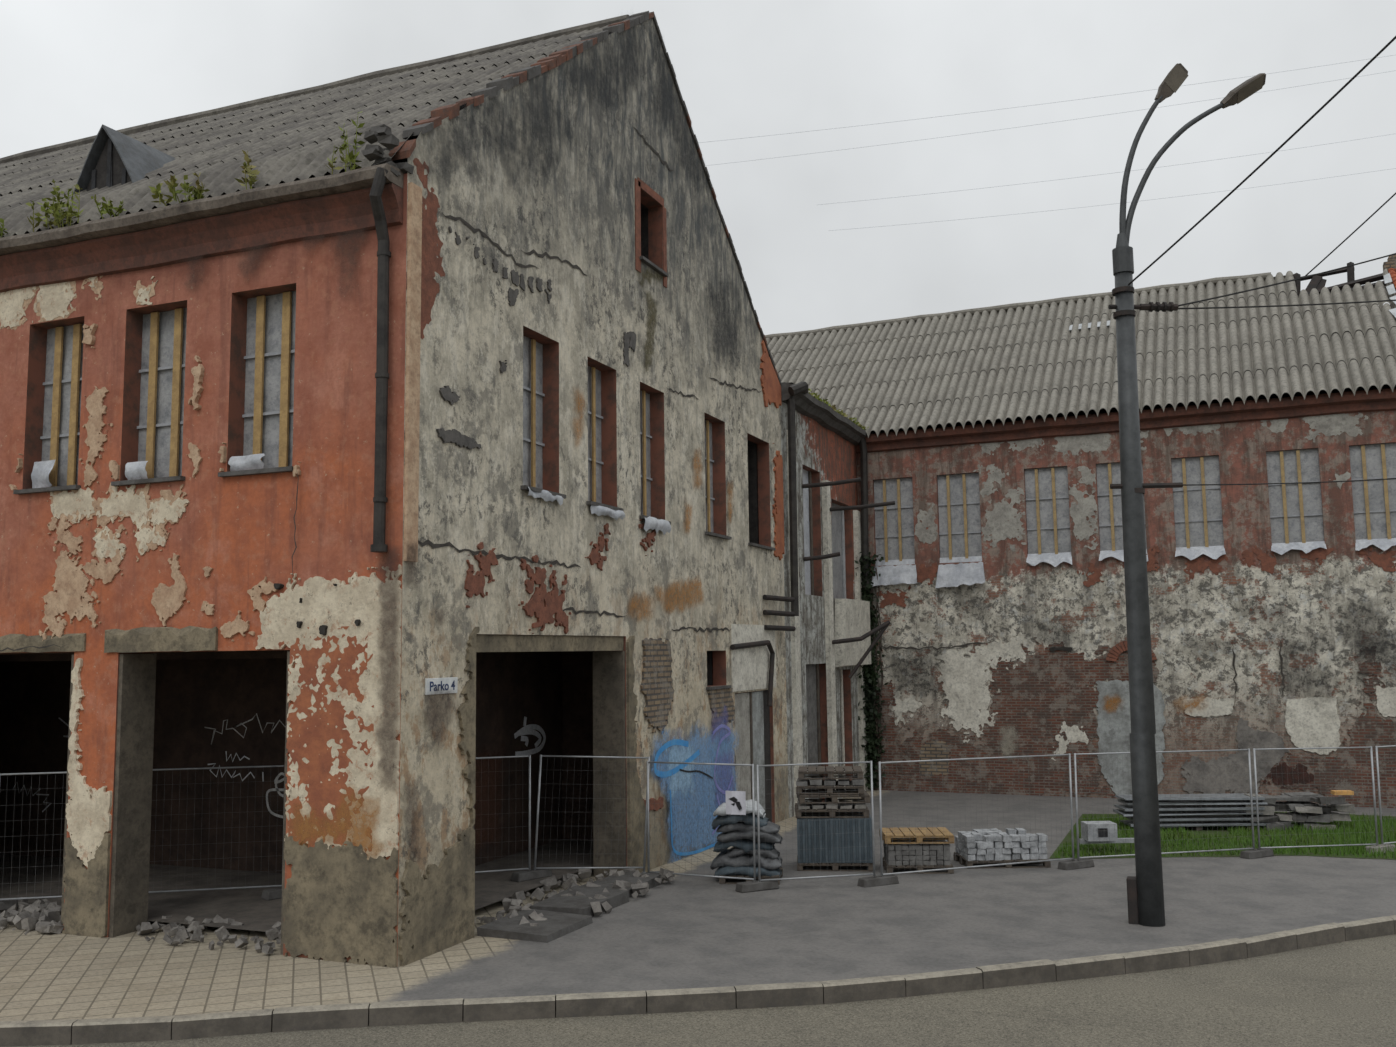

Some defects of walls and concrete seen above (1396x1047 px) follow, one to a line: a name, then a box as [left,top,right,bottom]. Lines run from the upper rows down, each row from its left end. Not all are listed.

crack [634,127,673,171]
crack [441,212,587,276]
peeling [0,276,104,349]
peeling [971,433,1124,587]
peeling [464,542,498,608]
peeling [518,555,571,634]
peeling [585,523,611,571]
flaking render [1183,545,1277,581]
flaking render [1300,548,1334,565]
peeling [39,385,481,968]
flaking render [869,632,1129,798]
flaking render [1181,646,1396,808]